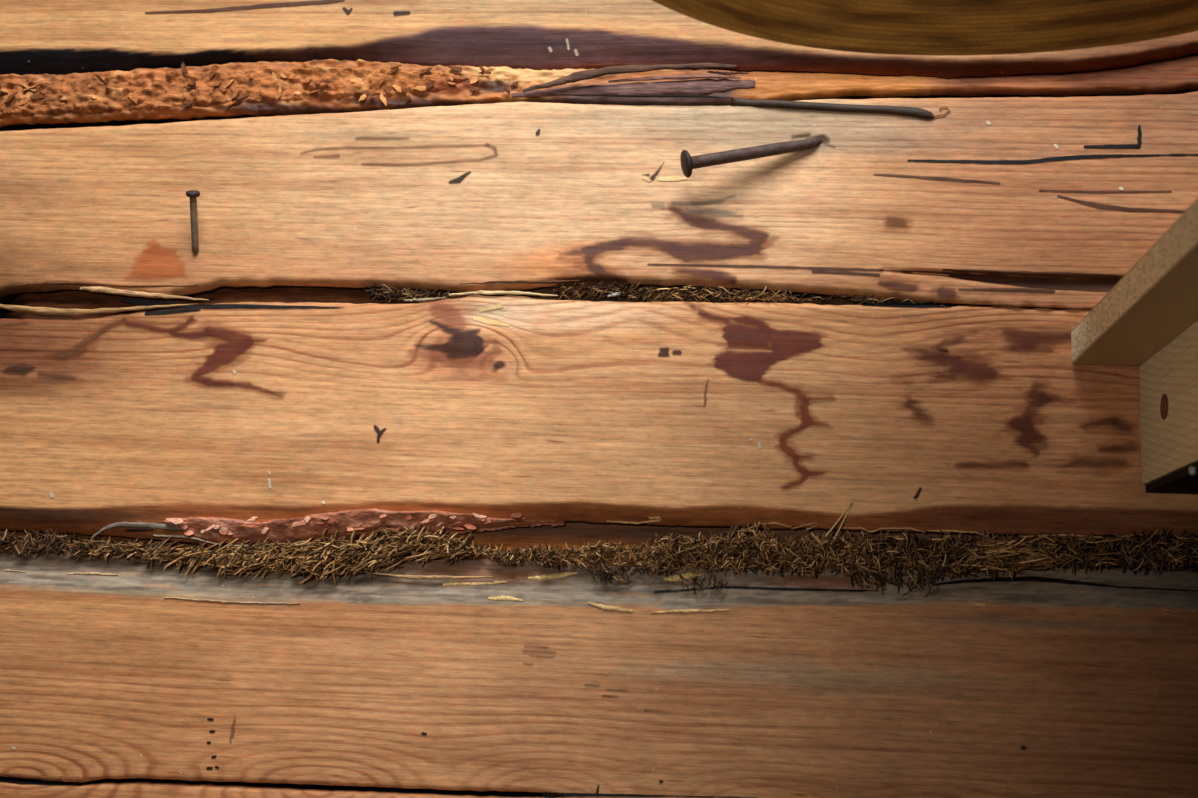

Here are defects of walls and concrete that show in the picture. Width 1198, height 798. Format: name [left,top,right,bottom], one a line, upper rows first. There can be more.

peeling [351,63,491,106]
leakage [563,200,770,285]
crack [119,298,342,315]
crack [648,263,1123,307]
leakage [48,317,273,393]
leakage [690,304,821,381]
leakage [1008,385,1050,452]
peeling [166,516,269,536]
peeling [292,516,365,531]
peeling [380,512,492,530]
crack [0,778,83,786]
crack [542,785,758,798]